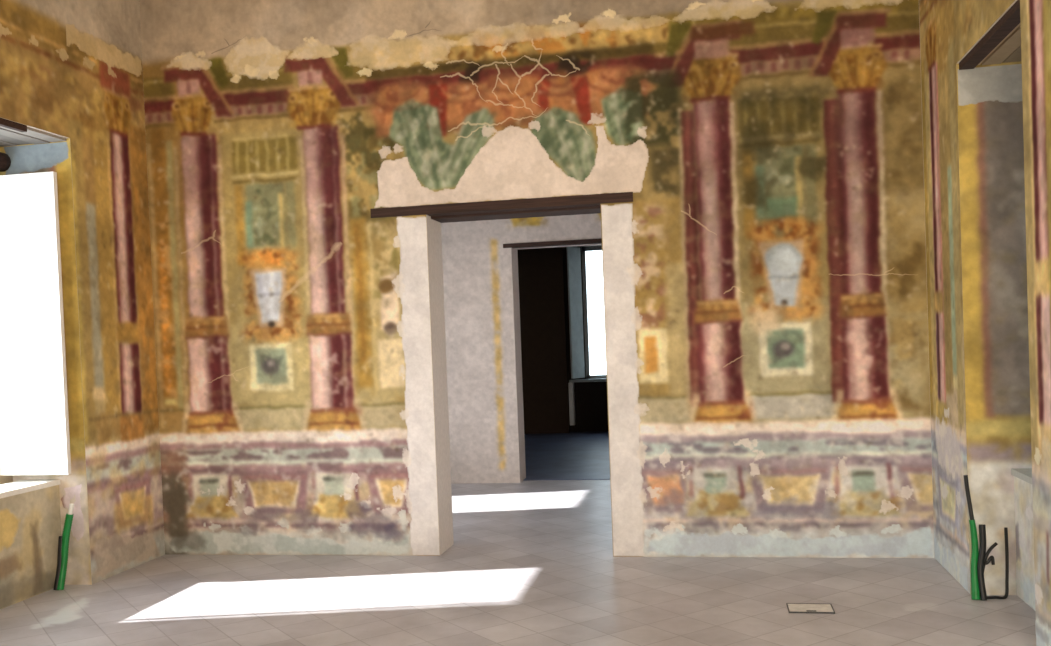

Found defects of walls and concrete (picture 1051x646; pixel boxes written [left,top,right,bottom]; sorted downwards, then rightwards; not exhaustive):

flaking render [55,23,142,79]
flaking render [166,0,778,83]
crack [440,39,590,141]
flaking render [794,0,915,13]
flaking render [170,112,968,591]